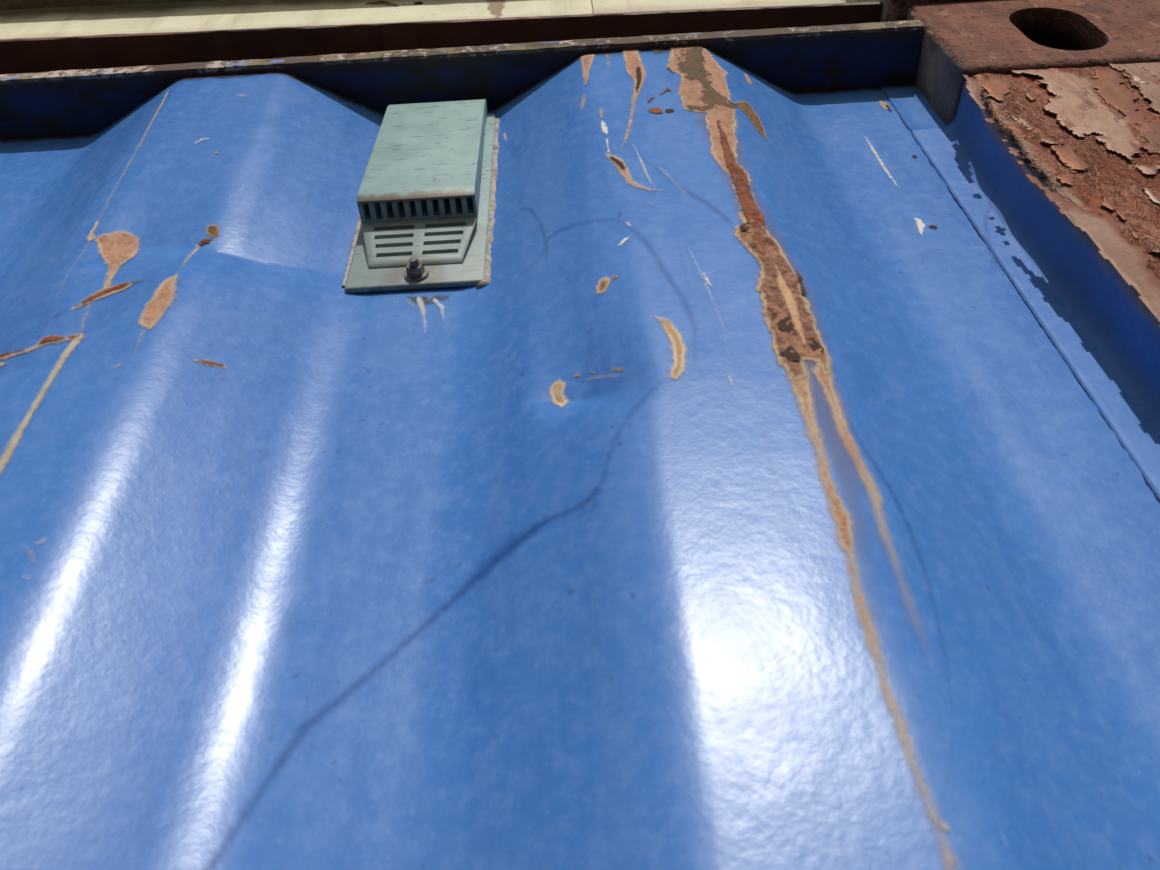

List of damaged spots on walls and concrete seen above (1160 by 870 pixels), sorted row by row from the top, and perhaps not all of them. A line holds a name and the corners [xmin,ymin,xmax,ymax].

peeling [963,62,1160,327]
spalling [656,317,686,379]
rust [668,46,925,790]